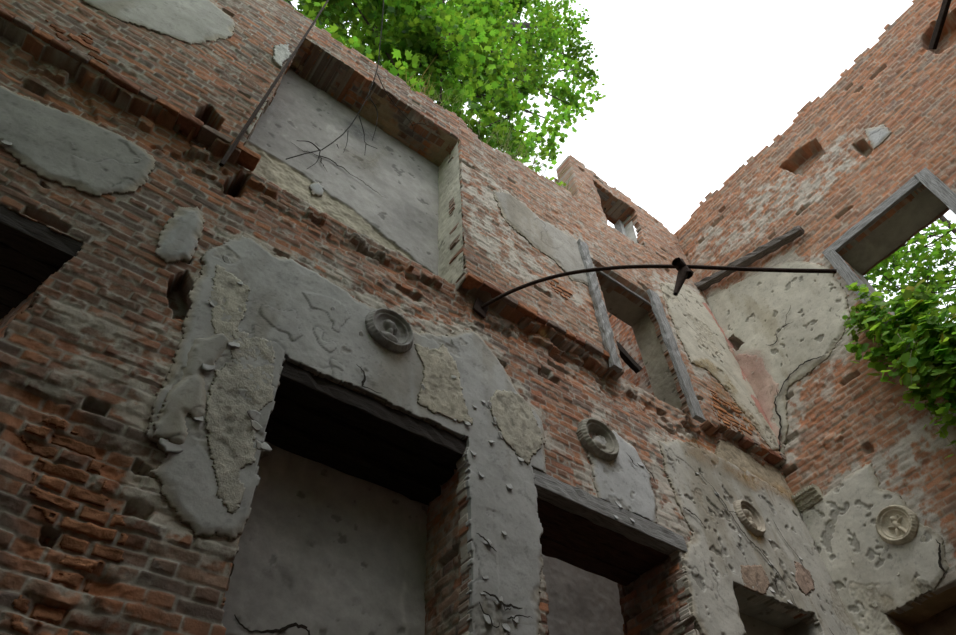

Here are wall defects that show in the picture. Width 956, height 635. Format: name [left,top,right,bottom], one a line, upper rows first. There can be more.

peeling [159,438,183,453]
peeling [193,255,276,514]
peeling [414,338,473,426]
crack [774,355,824,468]
crack [234,615,310,635]
crack [479,591,532,628]